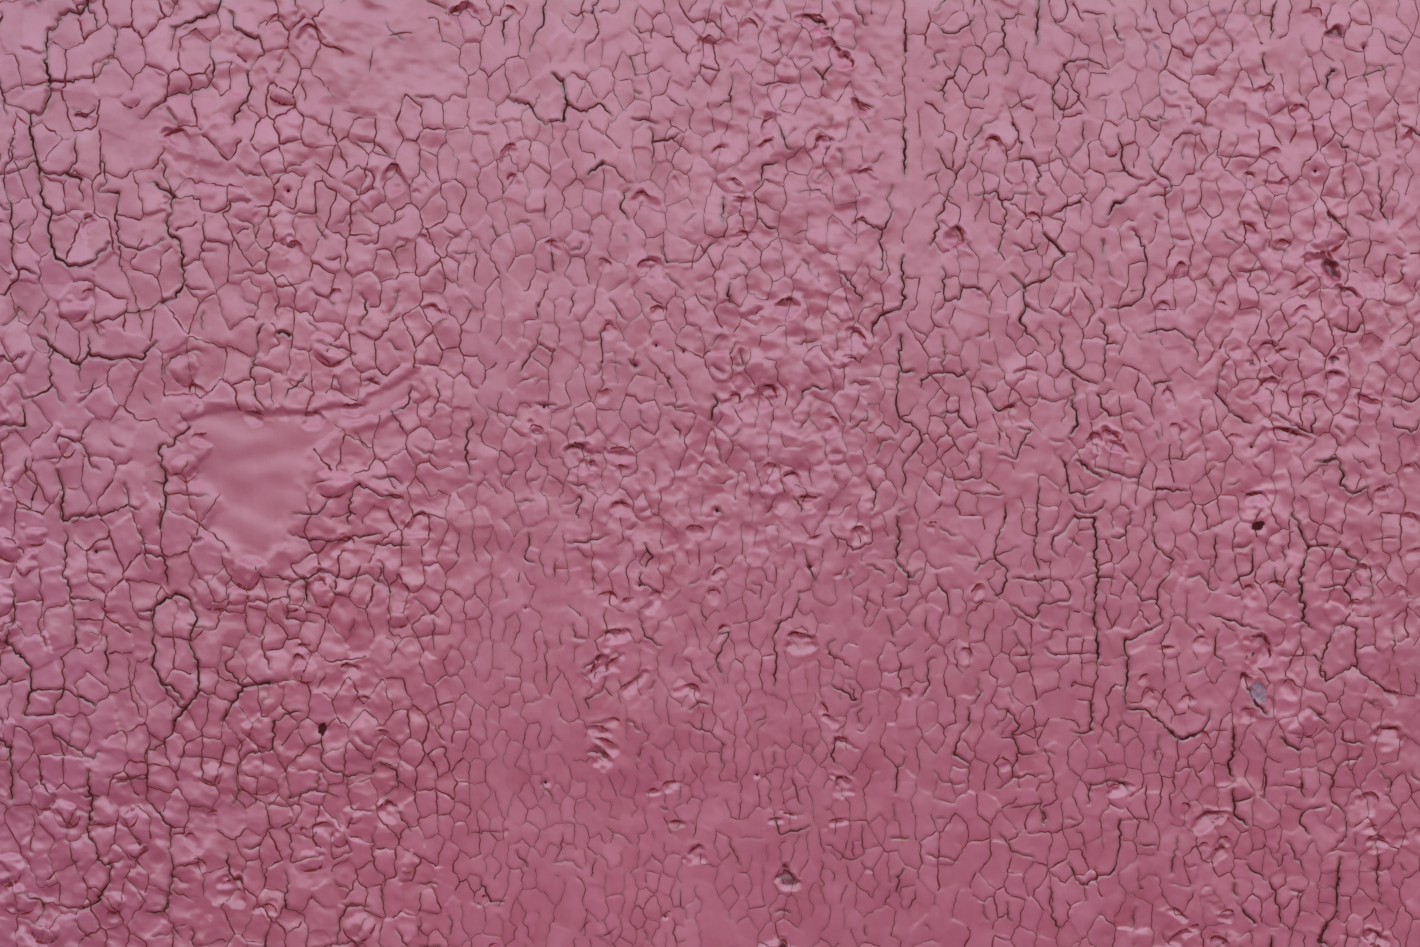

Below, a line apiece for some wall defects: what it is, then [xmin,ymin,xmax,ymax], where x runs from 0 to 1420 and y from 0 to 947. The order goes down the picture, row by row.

crack [1262,55,1297,145]
peeling [173,363,431,569]
crack [330,482,400,525]
crack [475,394,531,552]
crack [697,343,795,514]
crack [830,498,873,561]
crack [1114,361,1176,437]
crack [517,572,607,738]
crack [803,549,887,628]
crack [1214,613,1266,644]
crack [879,722,905,791]
crack [577,816,702,947]